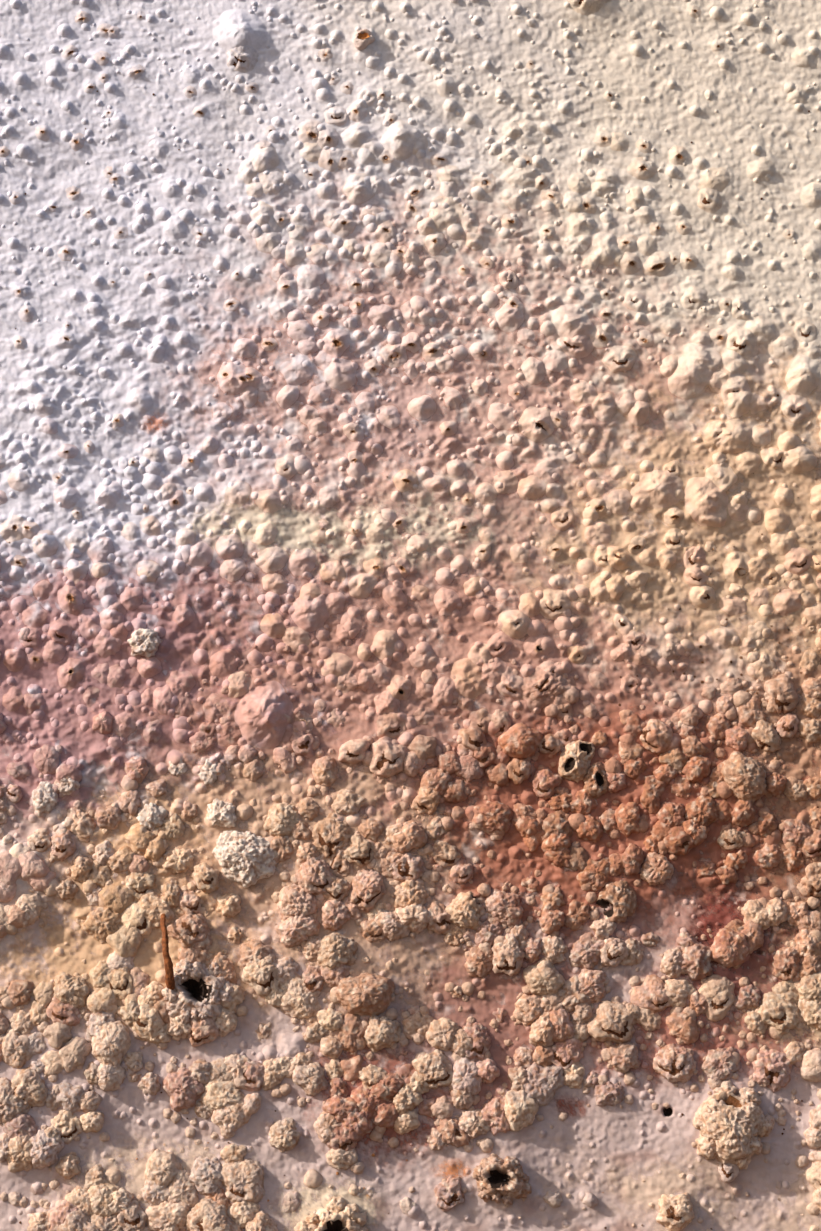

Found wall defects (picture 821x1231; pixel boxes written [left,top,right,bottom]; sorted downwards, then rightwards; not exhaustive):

water stain [0,274,821,1231]
corrosion [423,947,541,1110]
corrosion [409,613,821,1077]